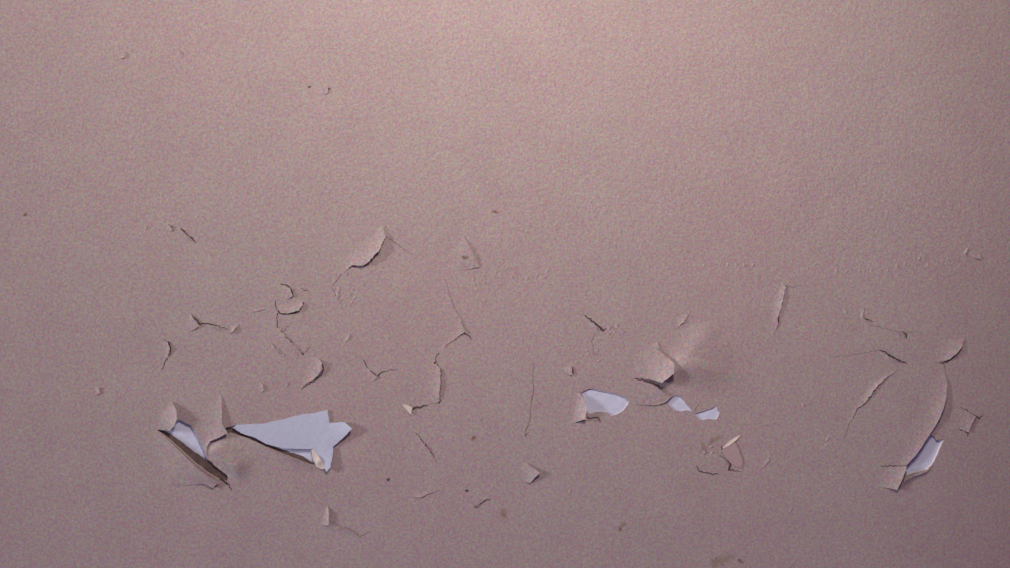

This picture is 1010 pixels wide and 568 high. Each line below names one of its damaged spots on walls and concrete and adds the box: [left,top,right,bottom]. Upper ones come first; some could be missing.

peeling [332,226,408,287]
peeling [453,237,479,270]
peeling [252,284,308,315]
peeling [770,283,800,338]
peeling [301,356,324,390]
peeling [402,362,442,414]
peeling [570,342,719,424]
peeling [152,393,352,491]
peeling [696,435,743,480]
peeling [874,365,947,490]